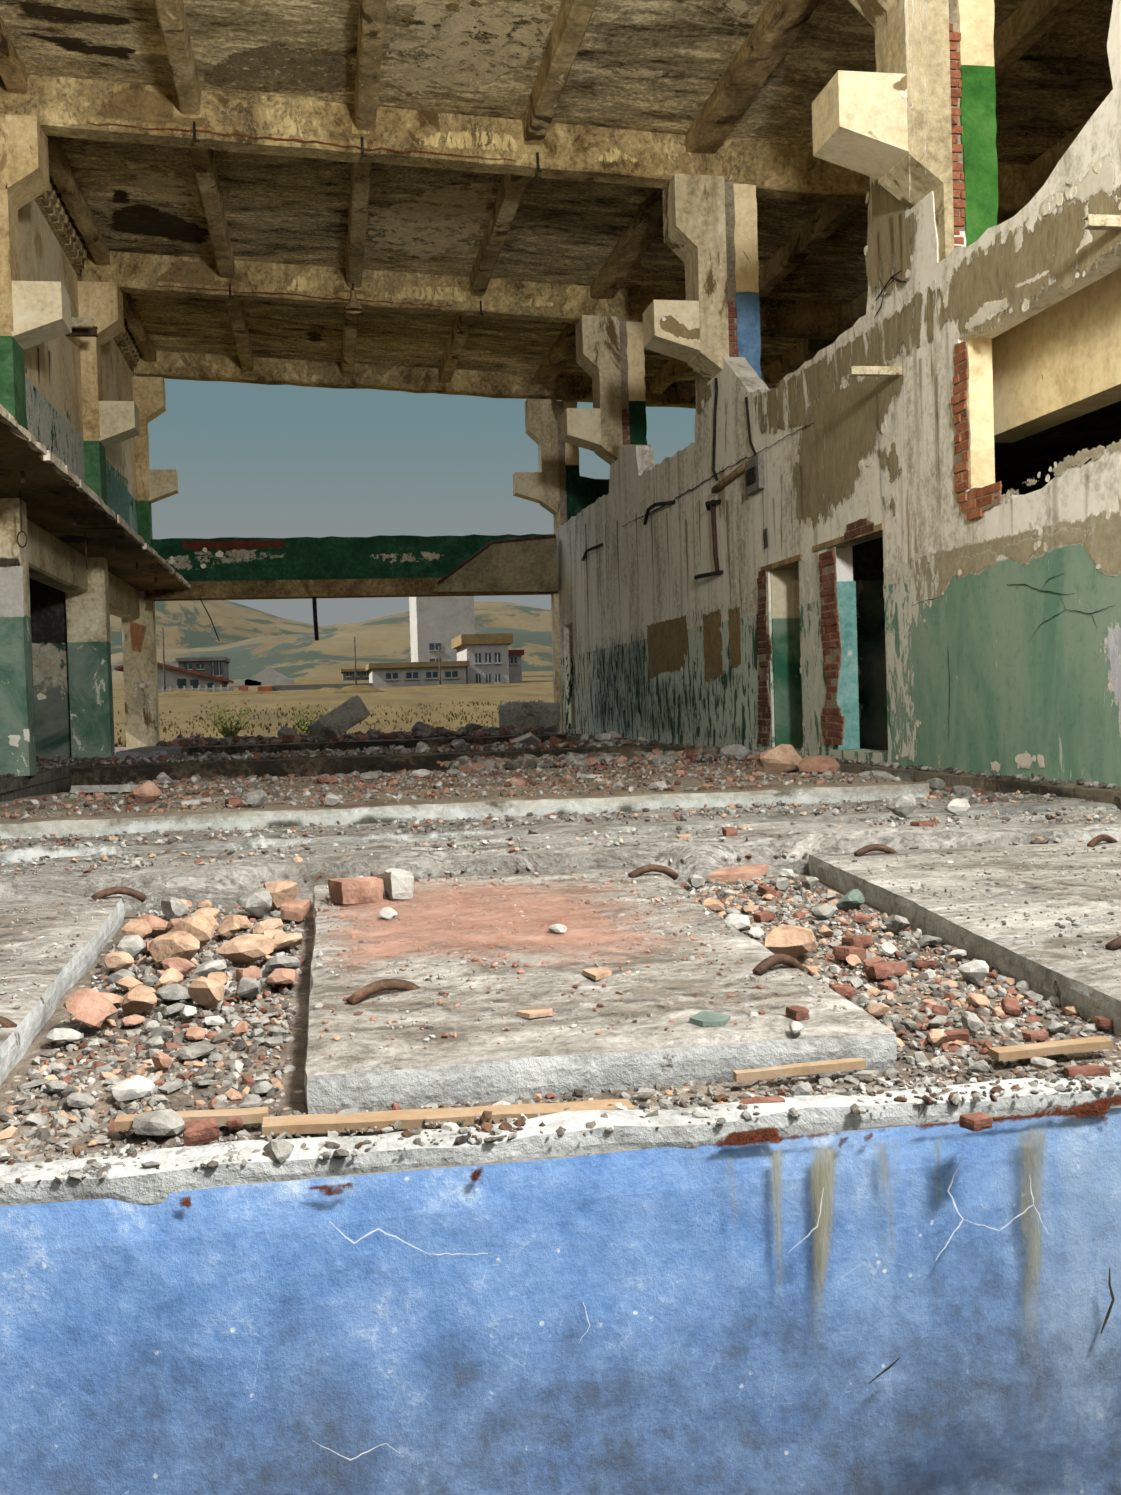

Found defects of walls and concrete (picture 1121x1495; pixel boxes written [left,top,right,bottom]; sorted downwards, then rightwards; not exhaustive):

flaking render [658,314,700,343]
flaking render [753,153,1121,762]
flaking render [594,570,772,745]
crack [1006,573,1115,641]
spalling [990,750,1072,798]
damp [772,1152,781,1260]
crack [788,1187,824,1253]
damp [812,1147,837,1296]
crack [936,1159,1048,1260]
damp [1022,1131,1045,1291]